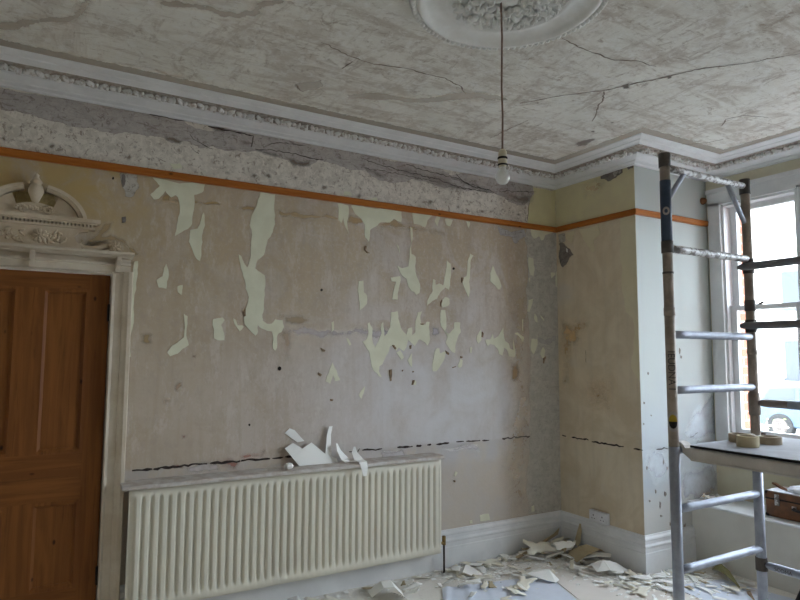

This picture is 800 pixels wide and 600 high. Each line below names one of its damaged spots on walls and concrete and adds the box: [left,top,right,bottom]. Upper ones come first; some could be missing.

crack [321,42,466,94]
crack [494,38,797,137]
flaking render [0,88,533,219]
peeling [150,178,205,261]
peeling [212,192,284,351]
peeling [338,191,402,242]
peeling [363,213,546,385]
peeling [498,224,601,287]
peeling [620,215,649,381]
crack [132,455,292,471]
crack [349,436,530,452]
crack [562,435,668,451]